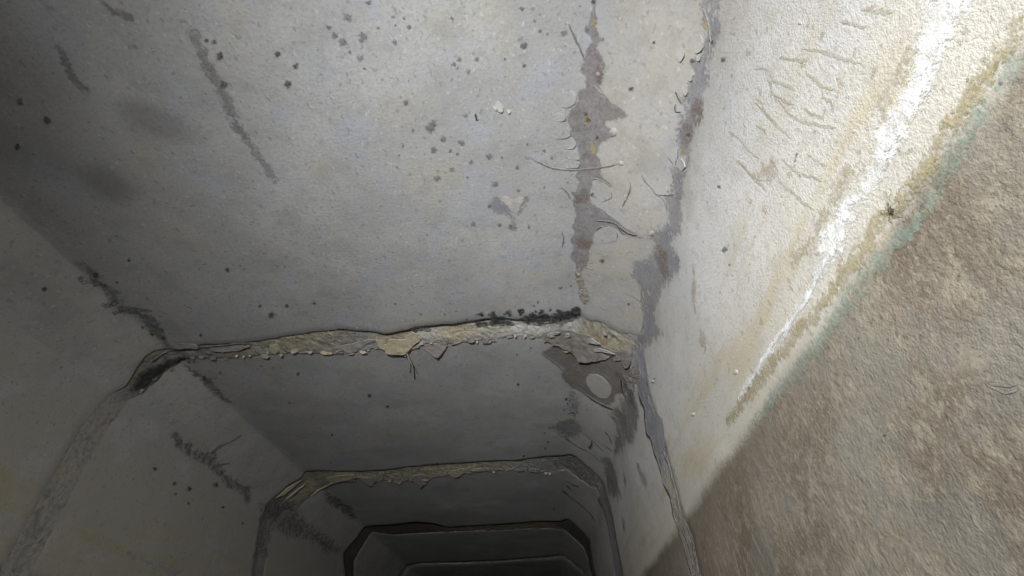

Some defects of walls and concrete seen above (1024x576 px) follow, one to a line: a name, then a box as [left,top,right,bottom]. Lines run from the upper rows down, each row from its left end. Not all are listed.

water stain [678,18,719,141]
water stain [466,0,636,325]
water stain [736,0,972,402]
peeling [167,332,423,360]
spalling [514,328,641,399]
water stain [543,347,638,496]
water stain [631,225,680,347]